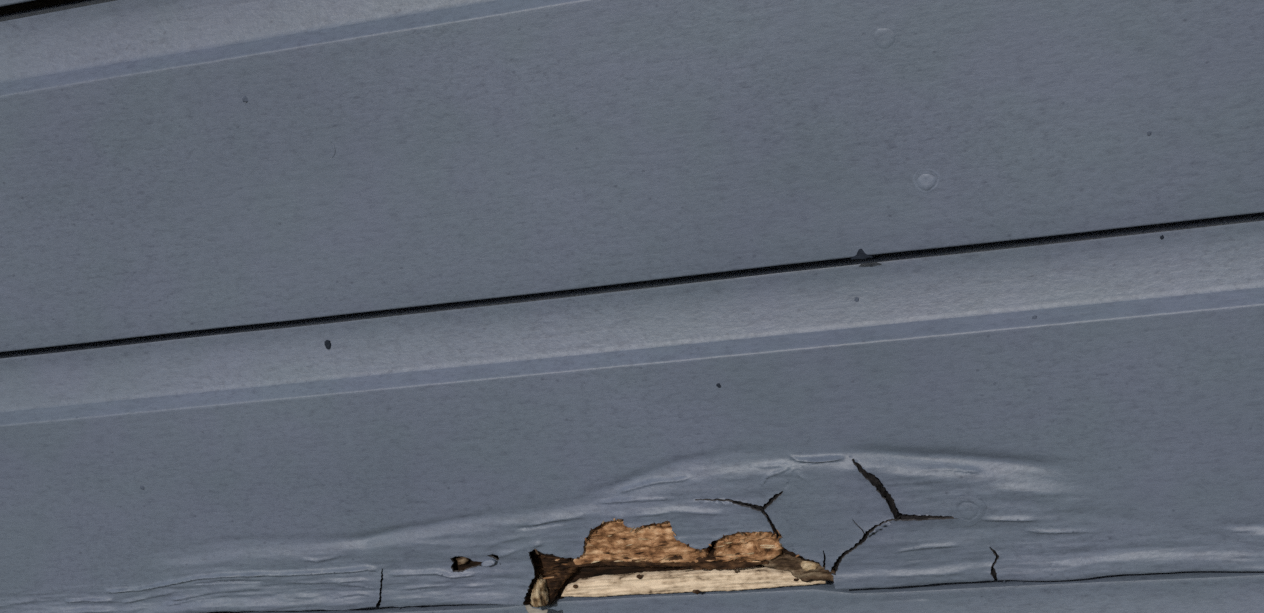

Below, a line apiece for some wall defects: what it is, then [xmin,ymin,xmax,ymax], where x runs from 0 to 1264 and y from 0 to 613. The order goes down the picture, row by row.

crack [712,491,783,538]
crack [823,459,953,571]
spalling [452,554,501,571]
spalling [778,540,825,567]
crack [990,547,999,582]
spalling [525,565,691,613]